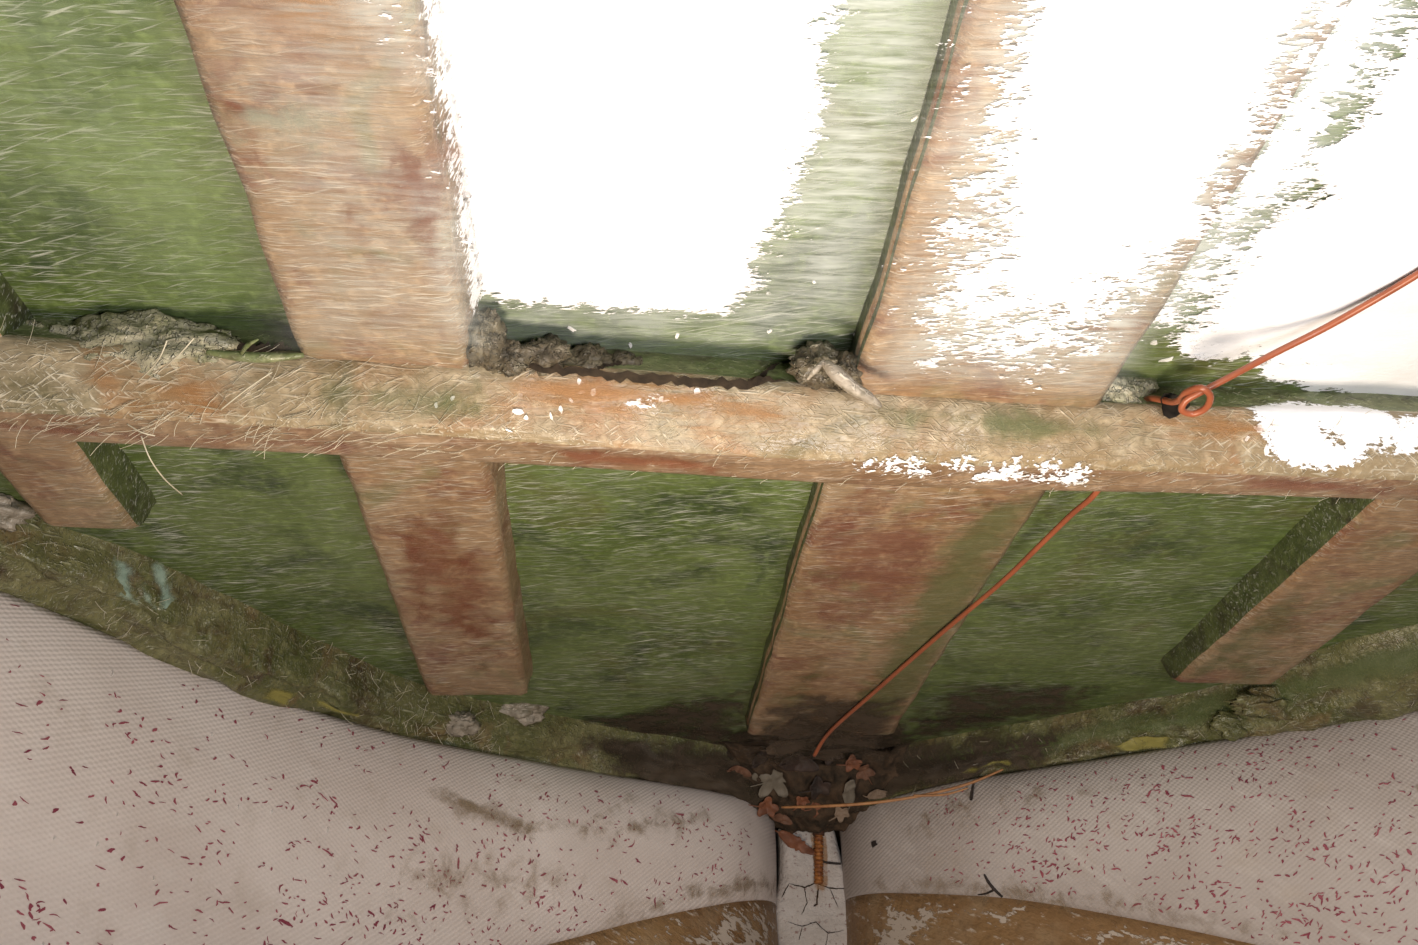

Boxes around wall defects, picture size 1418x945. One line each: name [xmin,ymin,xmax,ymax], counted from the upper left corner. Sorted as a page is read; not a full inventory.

damp [1118,736,1167,751]
peeling [627,902,778,945]
peeling [867,896,1026,945]
peeling [1077,926,1208,945]